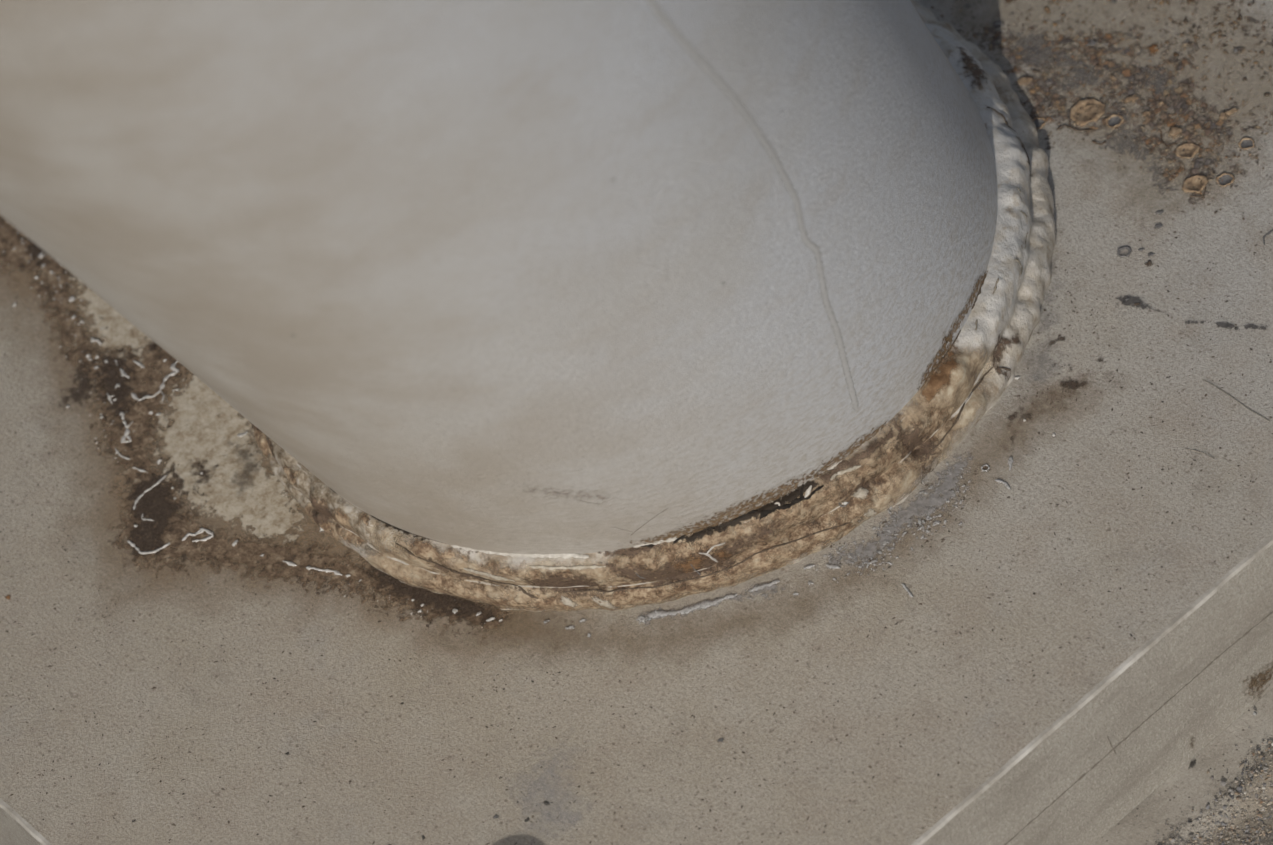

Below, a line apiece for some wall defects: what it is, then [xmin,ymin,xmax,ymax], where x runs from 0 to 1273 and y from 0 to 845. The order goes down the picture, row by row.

corrosion [931,0,1273,267]
corrosion [1185,316,1266,353]
corrosion [0,215,1182,637]
crack [369,514,850,599]
crack [598,429,893,557]